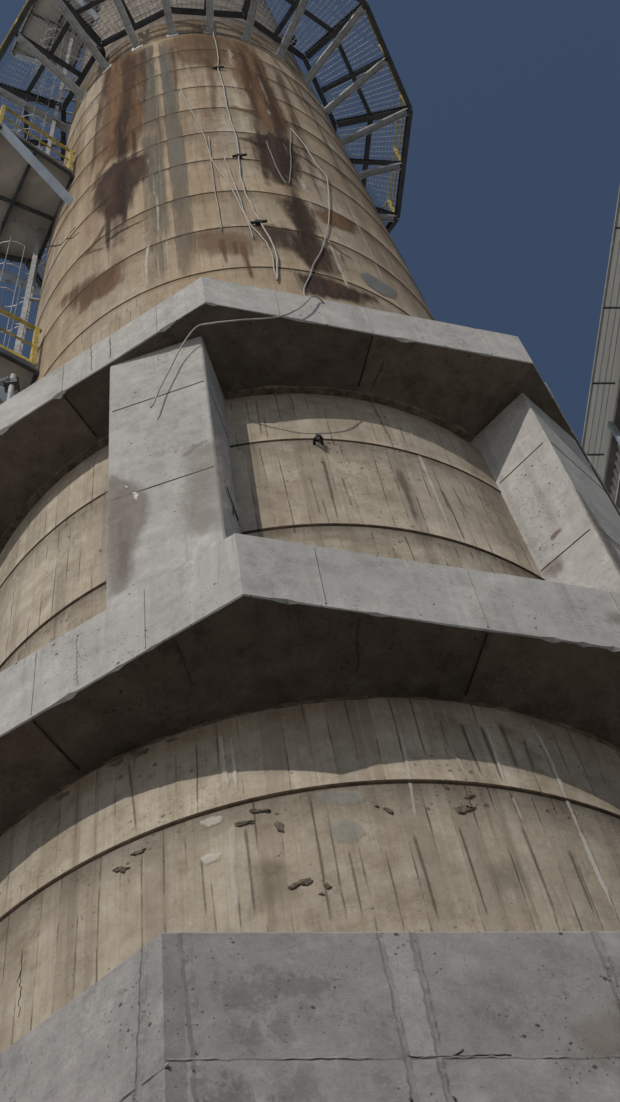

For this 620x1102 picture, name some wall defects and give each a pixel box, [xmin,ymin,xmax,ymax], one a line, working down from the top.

rust [86,50,149,253]
rust [226,41,378,303]
rust [221,240,252,276]
rust [61,264,120,310]
spalling [287,877,332,896]